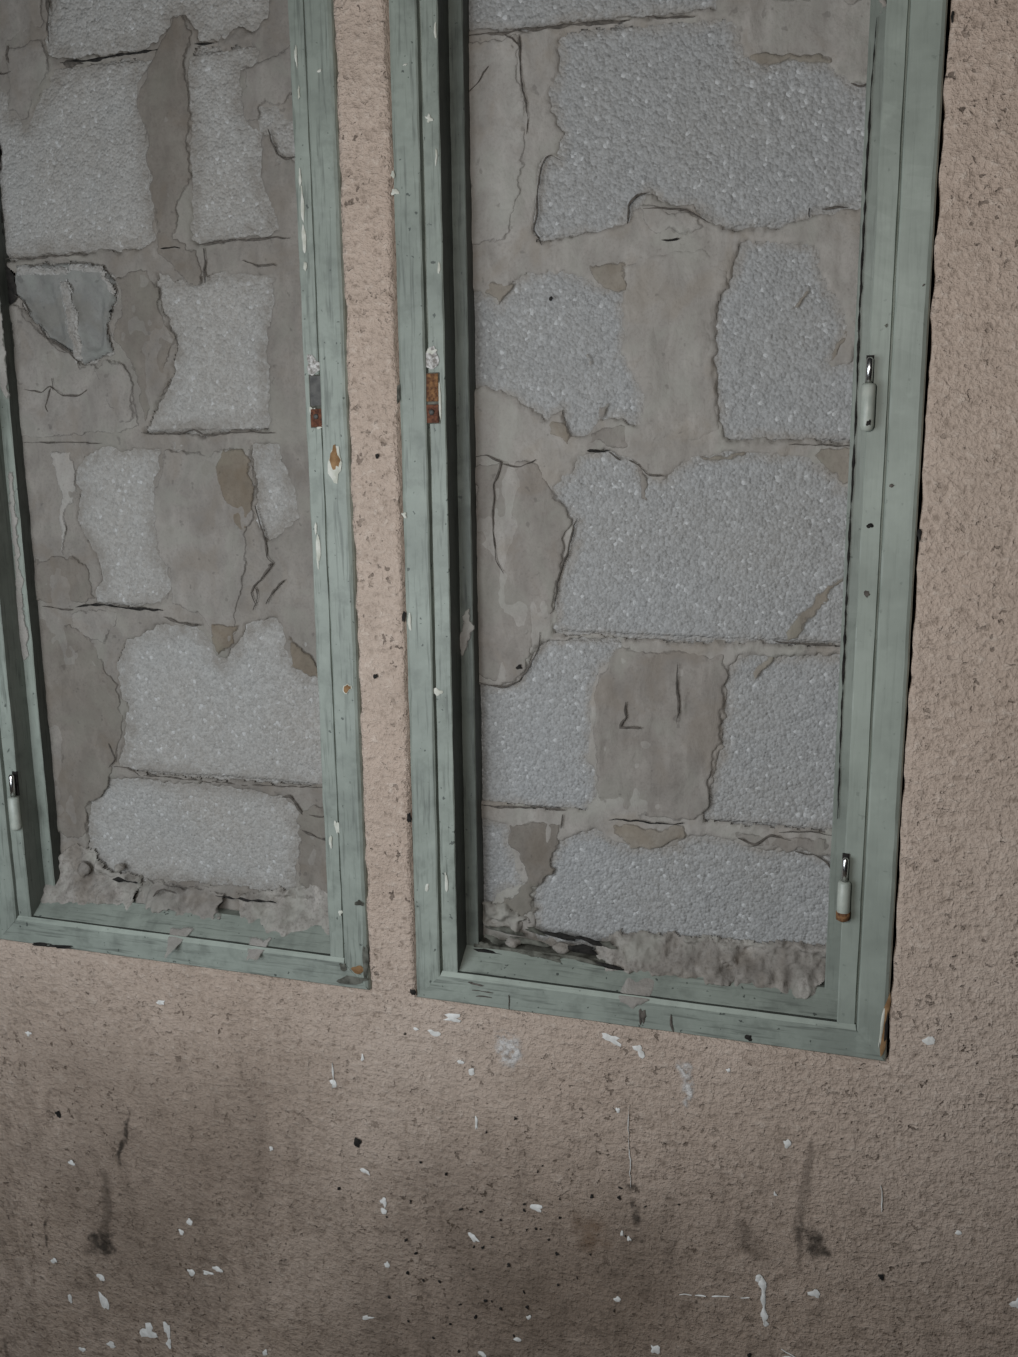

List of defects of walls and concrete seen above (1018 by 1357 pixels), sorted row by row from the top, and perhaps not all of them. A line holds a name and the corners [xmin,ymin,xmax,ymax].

peeling [299,168,307,271]
spalling [15,263,117,365]
peeling [307,354,320,376]
peeling [474,926,624,971]
water stain [498,1037,521,1066]
water stain [616,1108,646,1241]
water stain [806,1232,829,1256]
water stain [755,1274,768,1325]